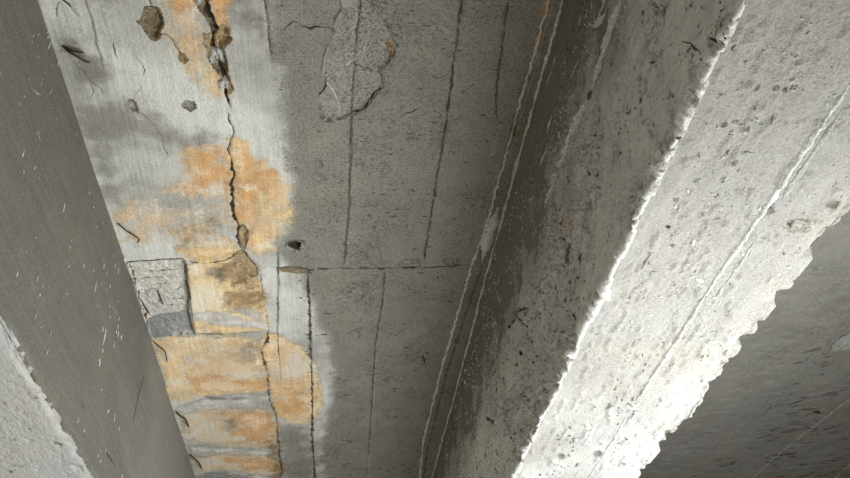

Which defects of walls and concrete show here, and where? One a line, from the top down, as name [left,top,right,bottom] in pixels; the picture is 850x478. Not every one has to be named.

spalling [136,6,165,42]
crack [162,34,189,64]
spalling [181,101,197,112]
spalling [195,0,235,94]
crack [192,0,256,266]
spalling [315,0,399,123]
crack [495,0,509,114]
spalling [127,259,195,339]
damp [38,0,337,478]
rust [110,137,323,477]
crack [250,0,470,478]
peeling [435,0,745,478]